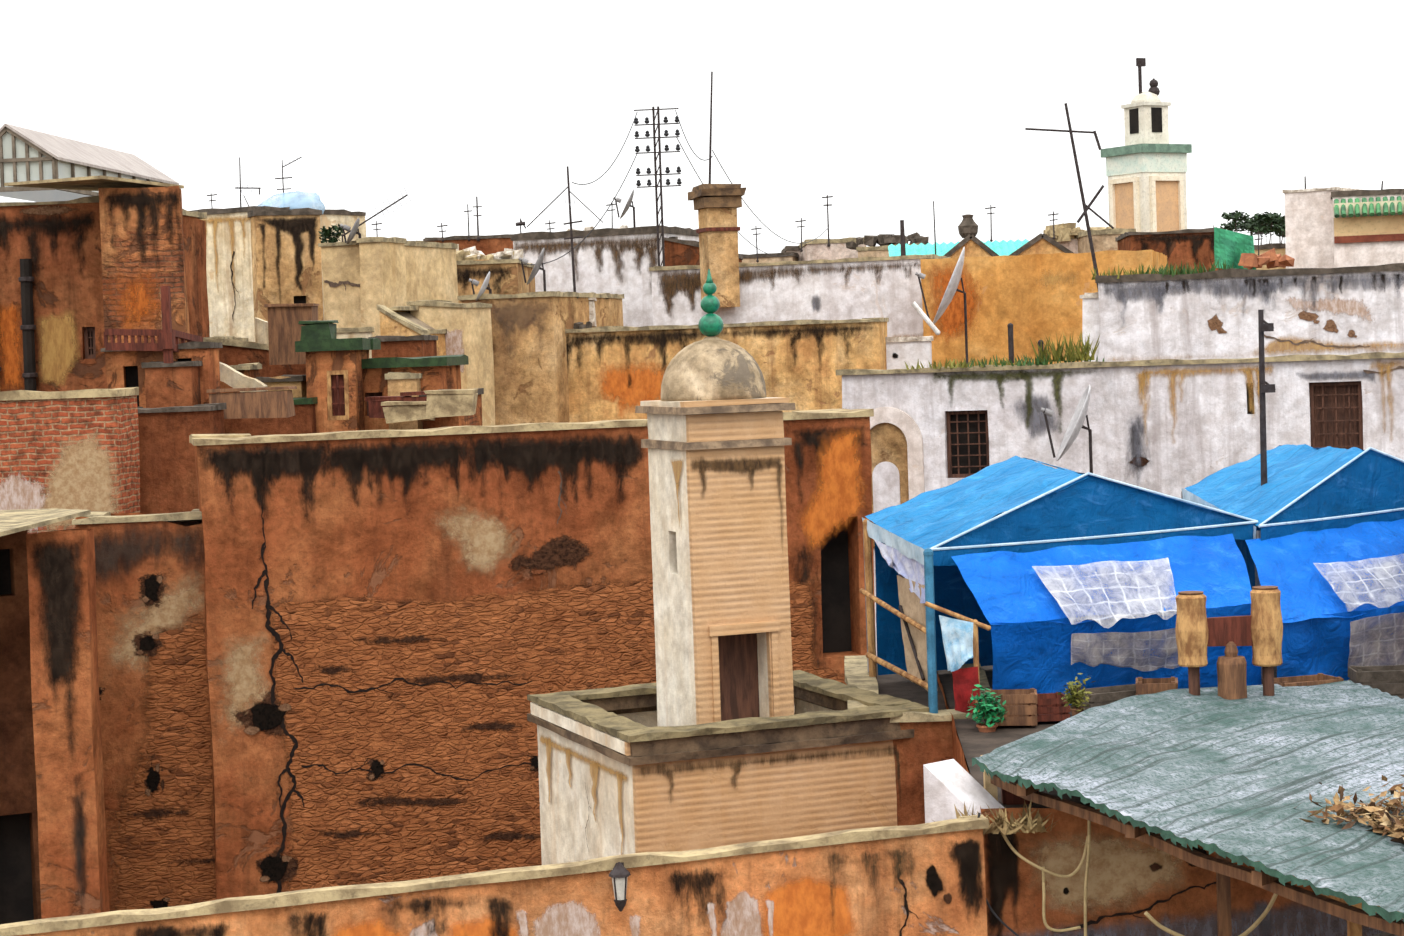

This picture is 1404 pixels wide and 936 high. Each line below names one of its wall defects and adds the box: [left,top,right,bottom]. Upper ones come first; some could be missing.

water stain [200,216,317,296]
water stain [514,236,704,386]
spalling [1207,315,1227,334]
peeling [1287,297,1371,338]
water stain [204,434,643,510]
water stain [1131,338,1403,479]
water stain [33,529,202,748]
spalling [106,575,216,911]
crack [252,501,533,893]
spalling [225,533,656,891]
spalling [789,582,847,685]
crack [896,856,919,936]